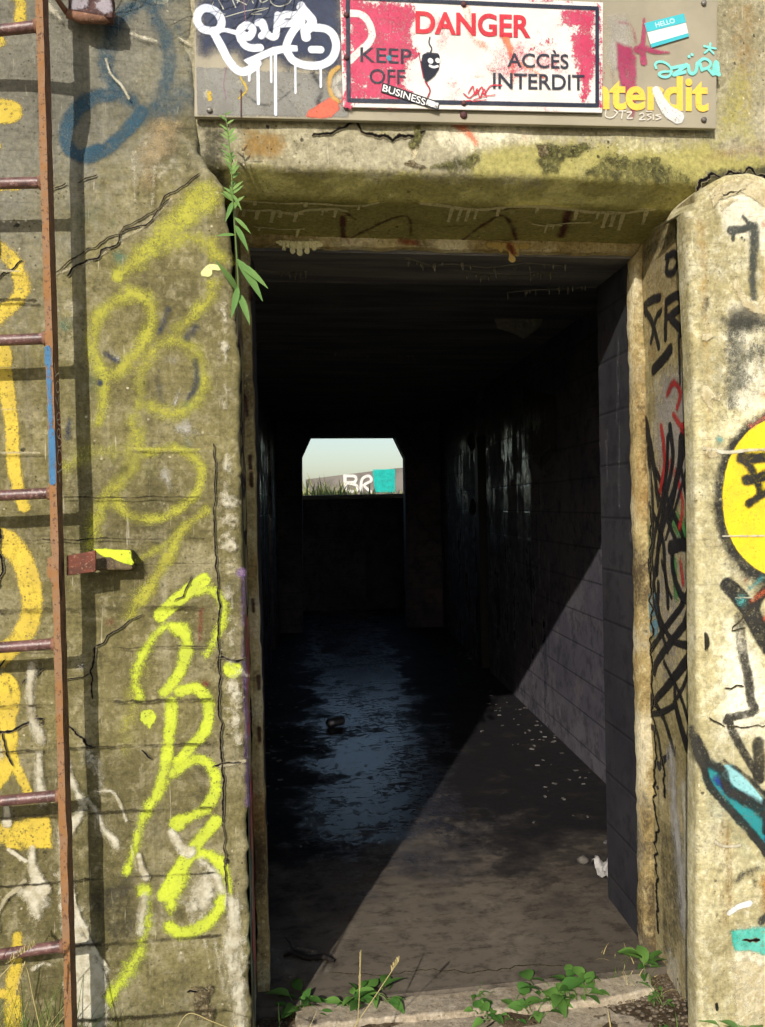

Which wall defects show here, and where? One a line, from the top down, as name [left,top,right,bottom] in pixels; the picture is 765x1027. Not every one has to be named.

crack [312,122,426,143]
crack [53,173,200,277]
crack [0,260,23,277]
crack [0,529,8,578]
crack [67,615,142,699]
crack [174,443,246,909]
crack [0,717,43,766]
crack [69,726,93,748]
crack [330,964,573,976]